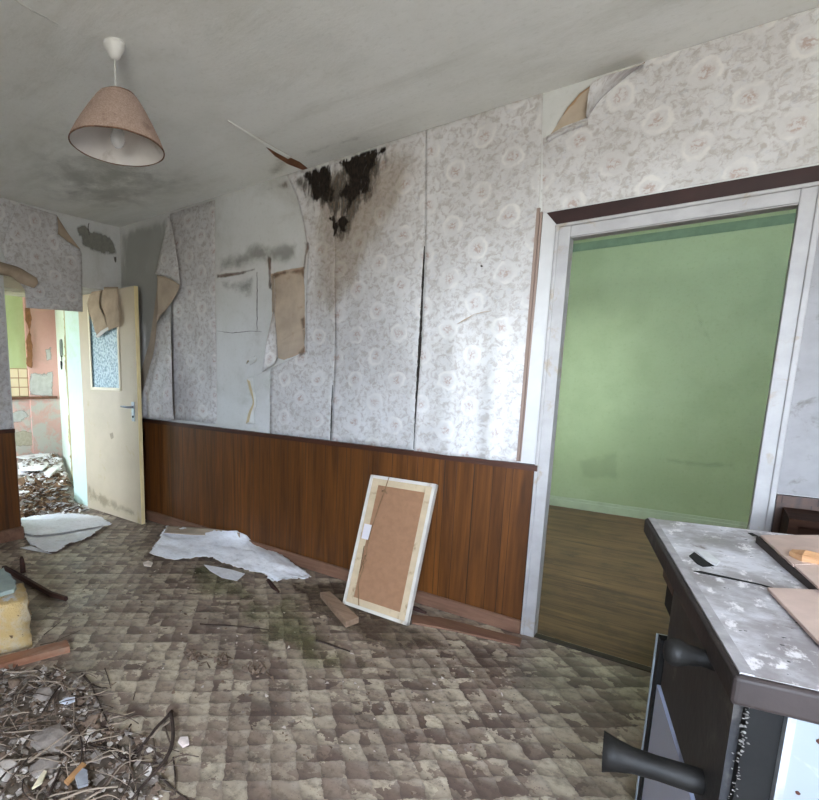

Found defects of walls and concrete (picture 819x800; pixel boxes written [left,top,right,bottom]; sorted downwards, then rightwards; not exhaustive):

damp [297,147,386,239]
spalling [78,226,116,262]
peeling [246,369,270,433]